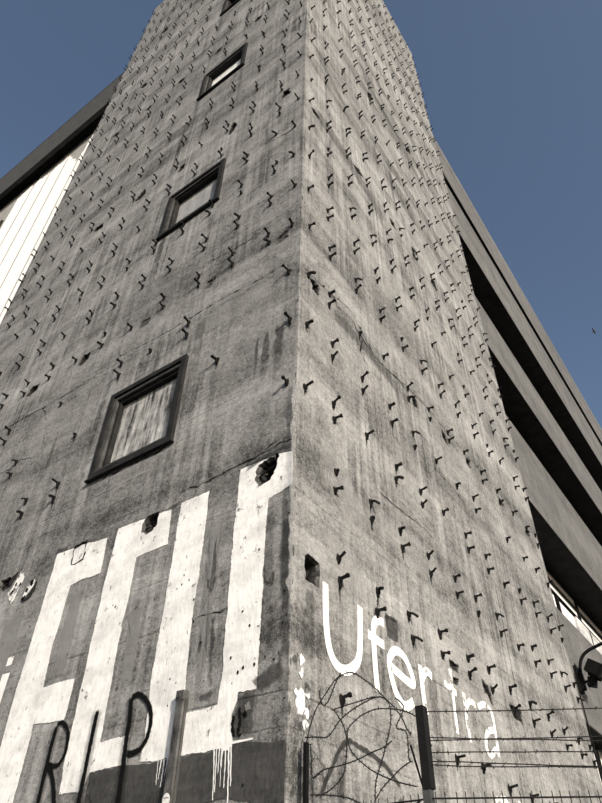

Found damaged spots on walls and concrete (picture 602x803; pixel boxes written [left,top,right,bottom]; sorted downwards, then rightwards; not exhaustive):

leakage [255,326,283,361]
crack [323,285,481,471]
crack [183,438,293,492]
spalling [248,445,286,487]
spalling [142,503,178,535]